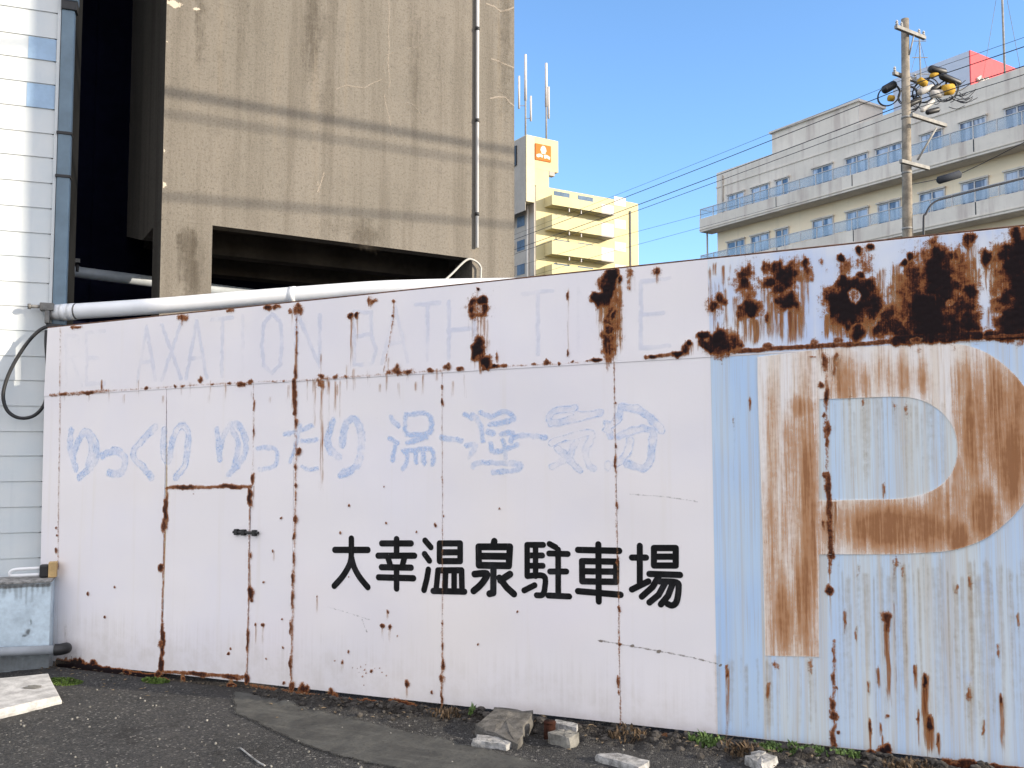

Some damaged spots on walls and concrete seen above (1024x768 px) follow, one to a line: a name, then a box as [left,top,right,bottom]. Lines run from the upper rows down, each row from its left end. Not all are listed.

corrosion [347,296,377,360]
corrosion [464,287,507,373]
corrosion [644,227,1024,674]
corrosion [55,483,387,702]
corrosion [867,611,897,694]
corrosion [866,714,892,754]